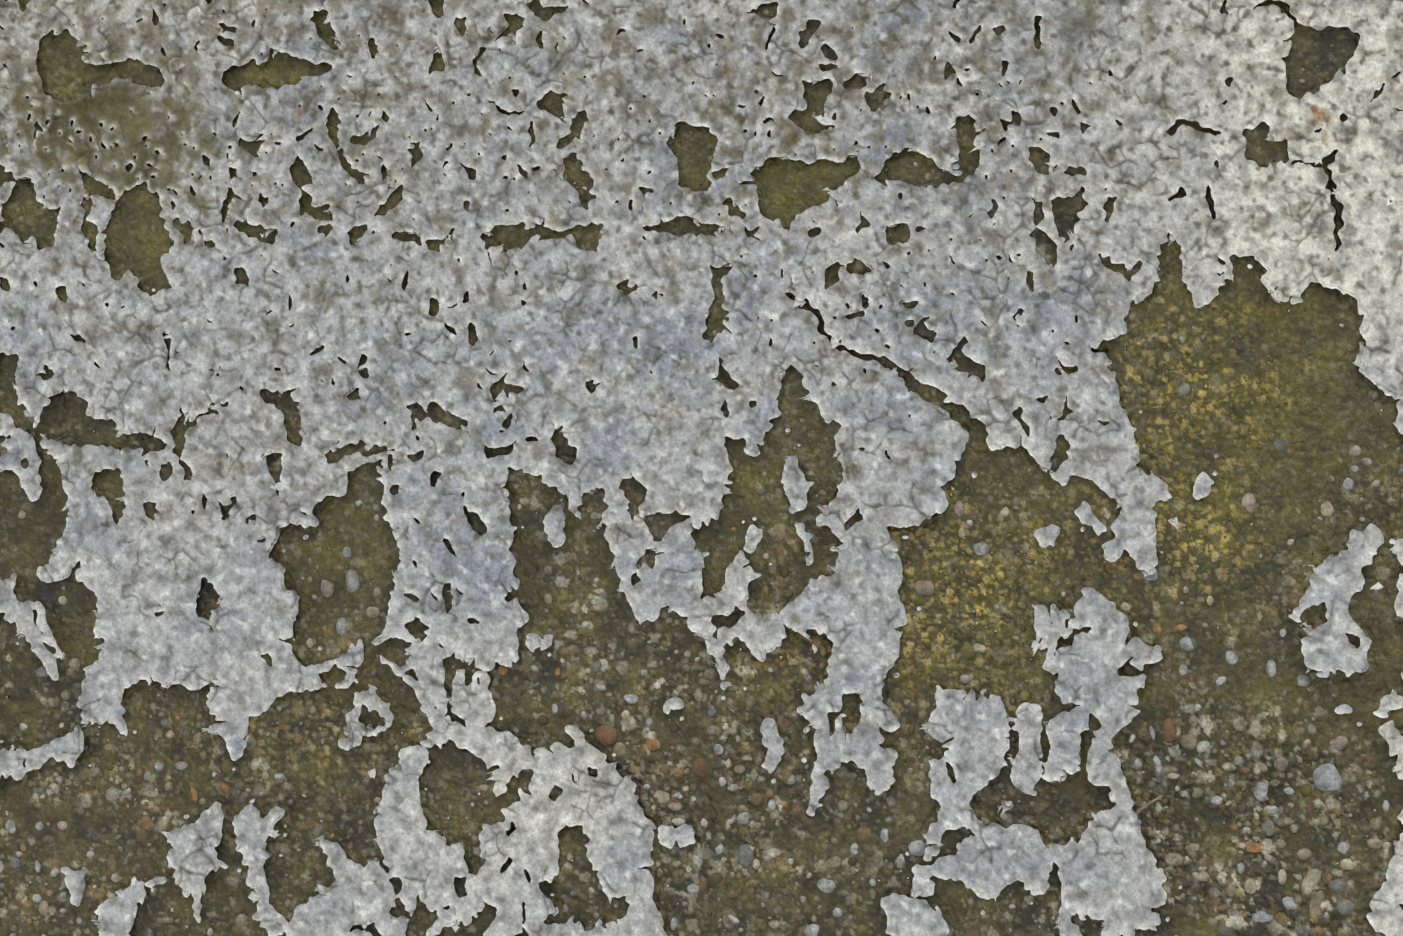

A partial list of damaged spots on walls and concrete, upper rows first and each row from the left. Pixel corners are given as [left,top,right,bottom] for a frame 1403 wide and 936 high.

peeling [0,0,609,301]
peeling [624,0,1123,327]
peeling [1277,20,1368,107]
peeling [0,227,1403,936]